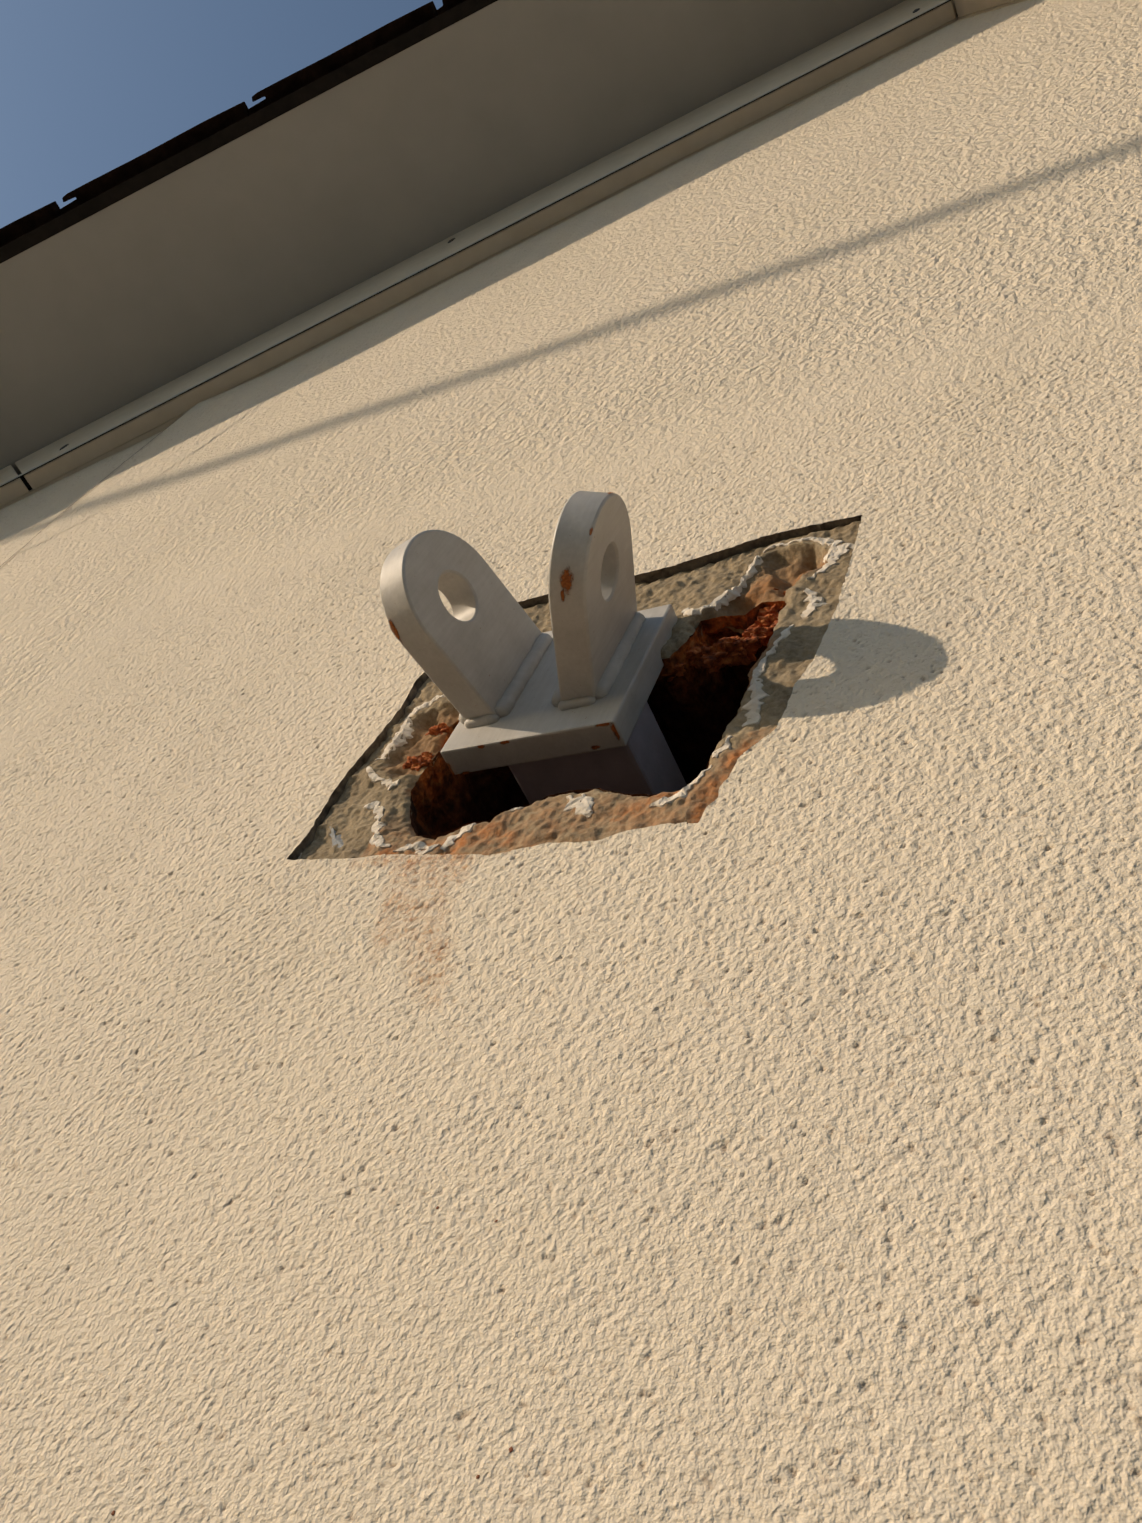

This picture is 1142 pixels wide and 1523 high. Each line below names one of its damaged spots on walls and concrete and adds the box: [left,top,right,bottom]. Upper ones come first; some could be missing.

hole [287,515,862,860]